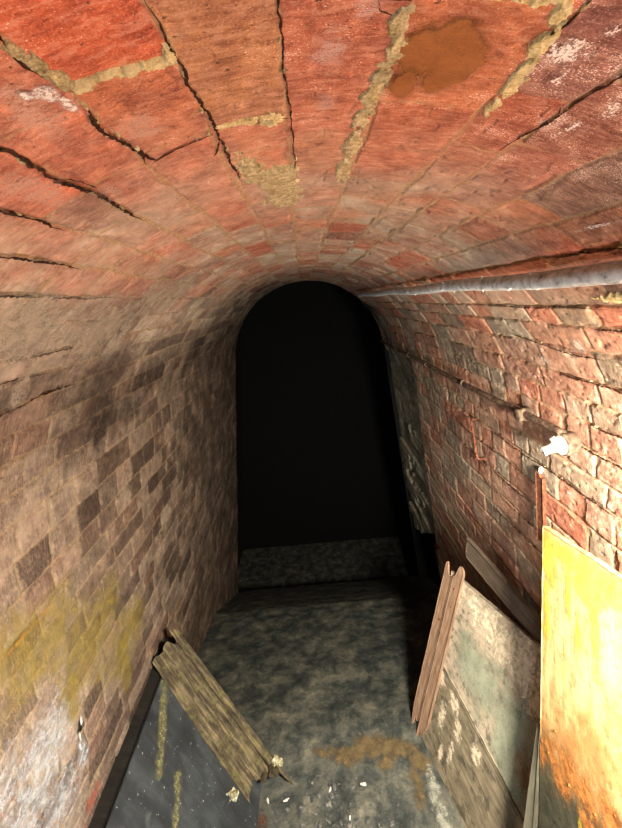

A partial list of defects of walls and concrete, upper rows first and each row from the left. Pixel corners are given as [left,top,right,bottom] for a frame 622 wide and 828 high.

spalling [0,39,177,96]
crack [80,0,243,185]
spalling [216,111,286,130]
crack [277,0,297,177]
spalling [335,3,416,184]
damp [389,18,489,97]
spalling [484,0,574,118]
crack [499,75,622,151]
crack [0,210,64,231]
crack [0,148,143,221]
spalling [234,151,305,208]
crack [0,256,81,270]